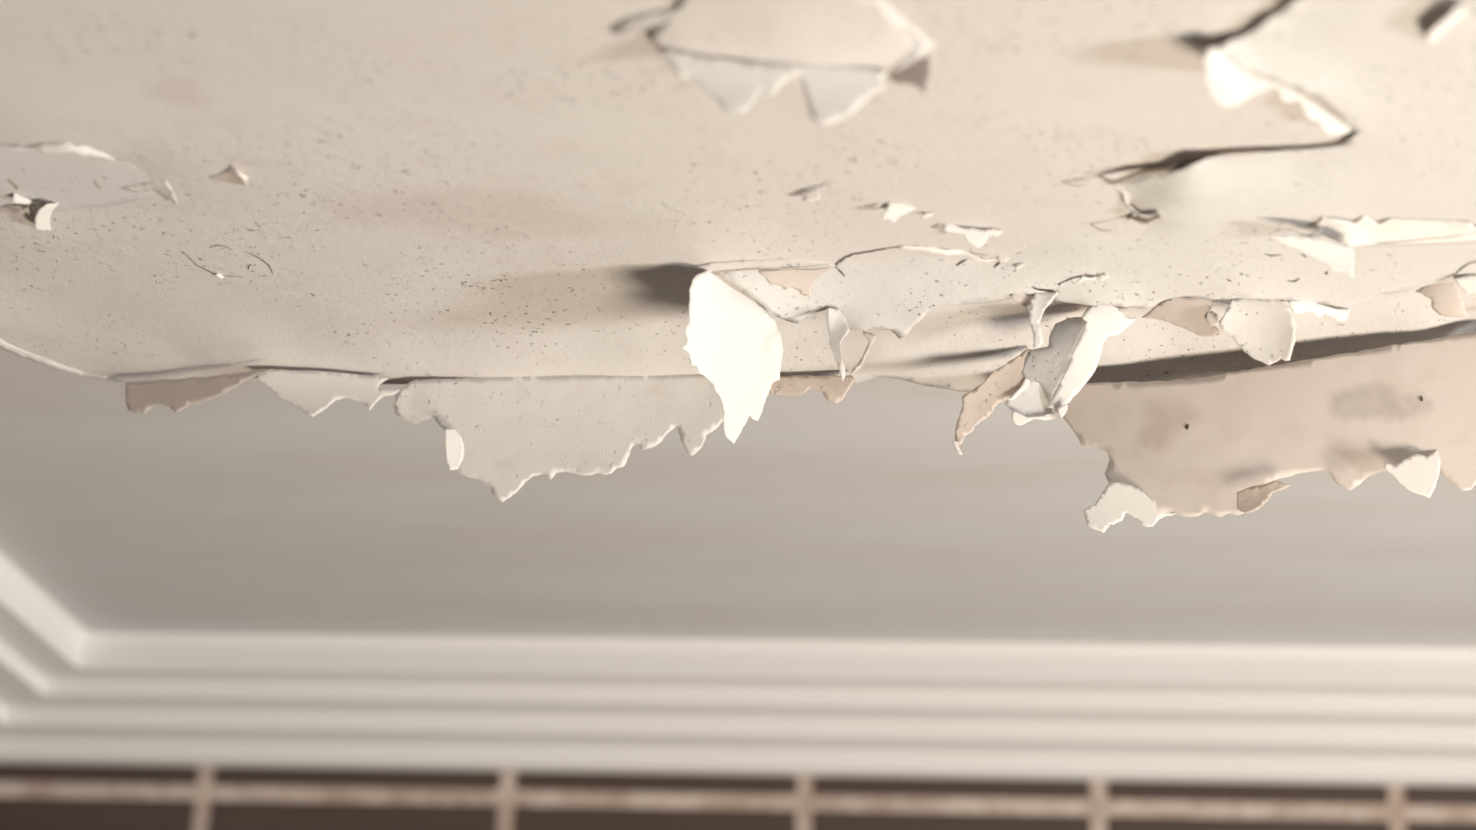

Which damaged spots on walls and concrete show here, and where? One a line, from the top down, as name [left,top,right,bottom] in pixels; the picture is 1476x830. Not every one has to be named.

peeling [0,0,1476,533]